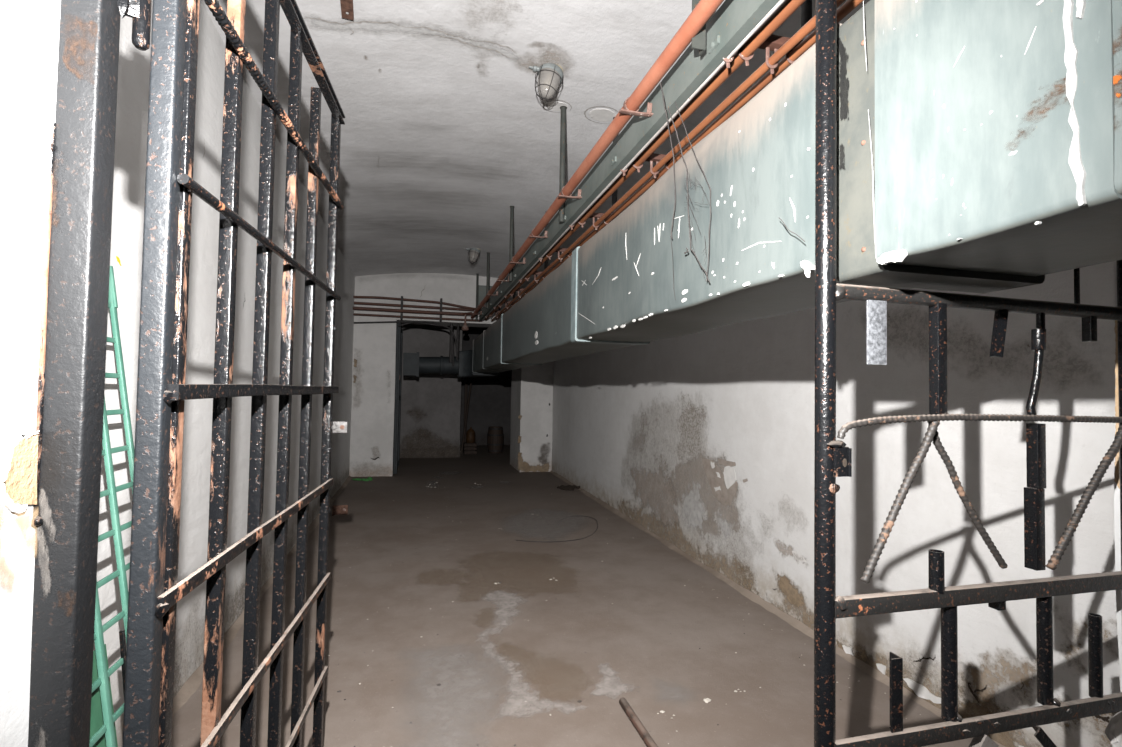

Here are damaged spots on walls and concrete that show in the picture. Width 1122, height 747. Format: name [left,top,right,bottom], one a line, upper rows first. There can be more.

corrosion [1113,71,1122,104]
flaking render [1,431,39,514]
damp [618,396,759,594]
spalling [1046,320,1122,570]
damp [419,591,575,747]
damp [592,664,633,696]